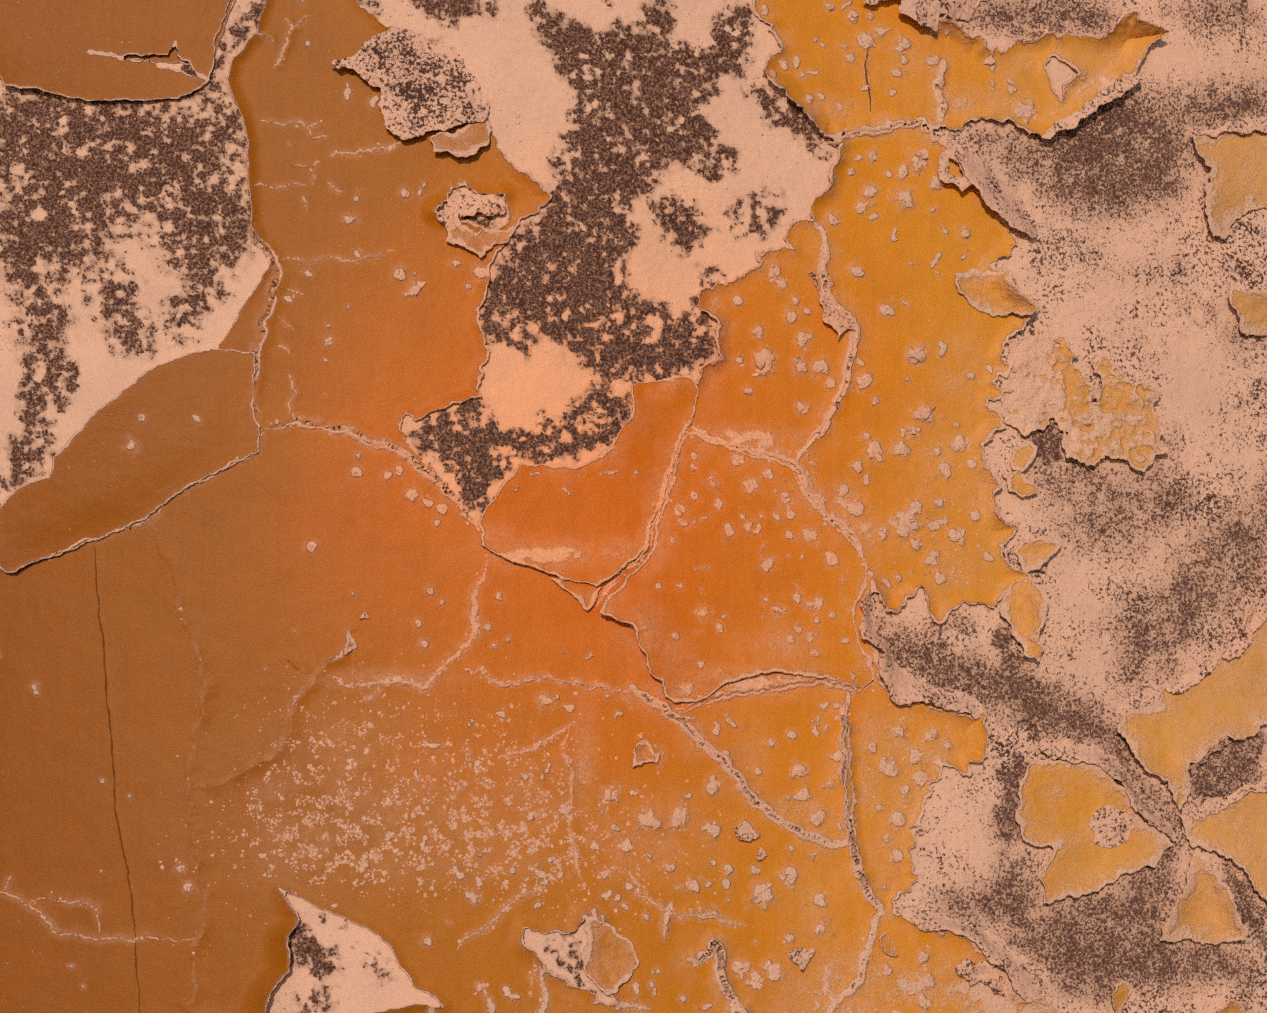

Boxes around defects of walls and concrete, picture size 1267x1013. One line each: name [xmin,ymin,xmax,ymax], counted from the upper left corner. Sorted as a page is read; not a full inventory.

peeling [0,0,271,573]
crack [0,226,477,1013]
peeling [344,630,357,655]
peeling [266,892,440,1013]
crack [324,554,886,1013]
crack [596,223,869,607]
peeling [356,0,1267,1013]